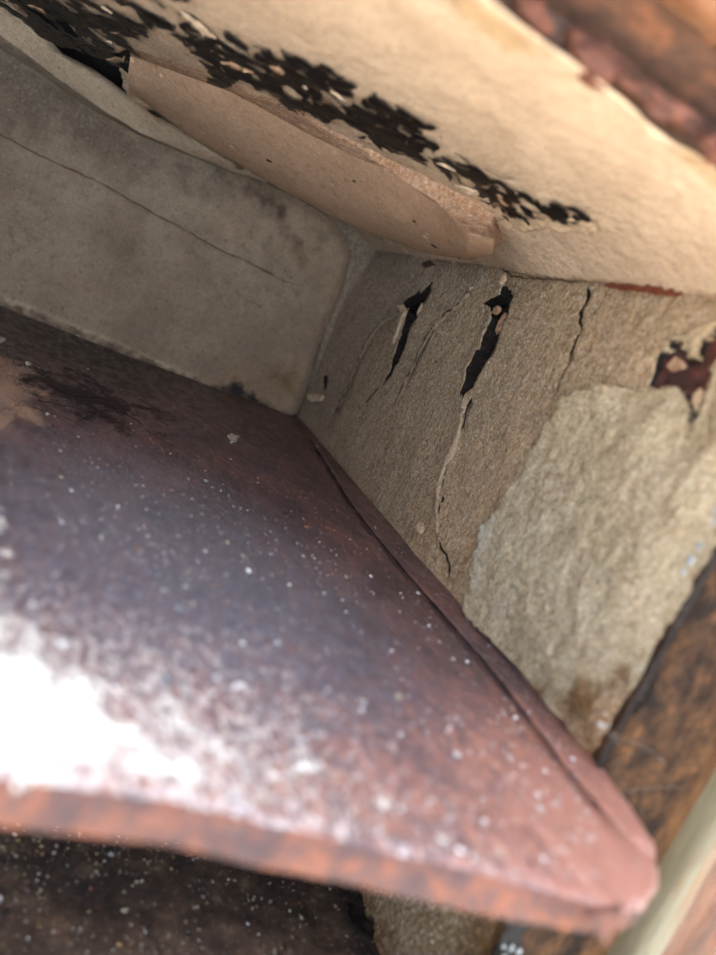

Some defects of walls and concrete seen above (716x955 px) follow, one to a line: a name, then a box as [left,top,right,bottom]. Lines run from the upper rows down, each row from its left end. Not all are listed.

spalling [0,0,600,236]
corrosion [514,0,716,167]
crack [0,134,303,287]
corrosion [0,356,50,433]
crack [366,260,435,402]
crack [434,268,592,581]
peeling [461,319,716,757]
corrosion [564,666,630,734]